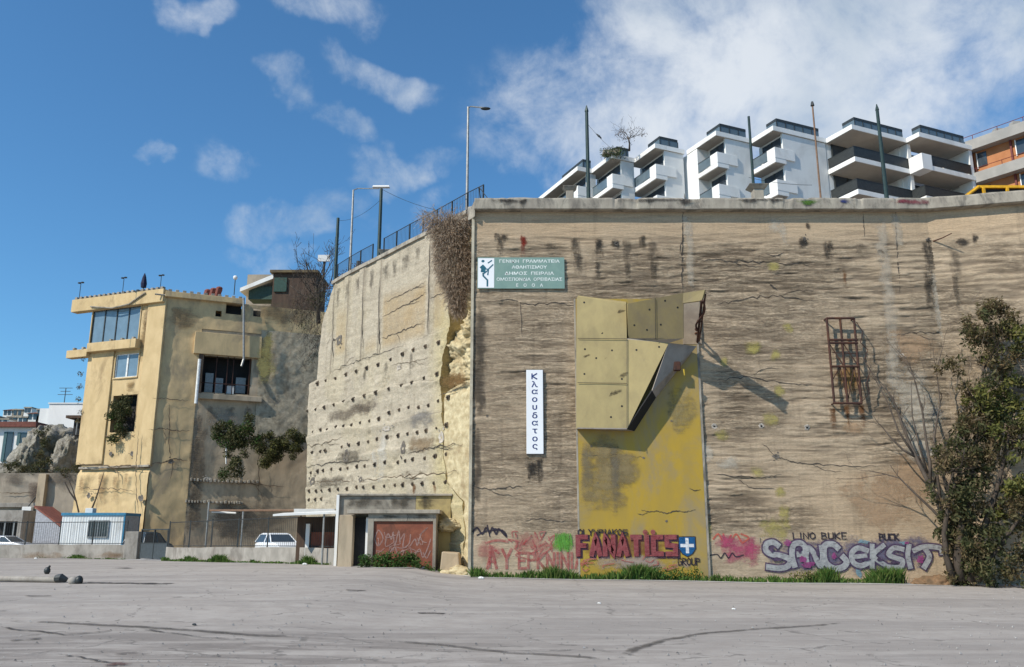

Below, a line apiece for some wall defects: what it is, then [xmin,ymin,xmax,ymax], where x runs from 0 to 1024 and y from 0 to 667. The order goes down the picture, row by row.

crack [680,194,818,304]
damp [877,216,943,498]
damp [186,415,206,529]
damp [582,440,637,505]
crack [640,445,870,515]